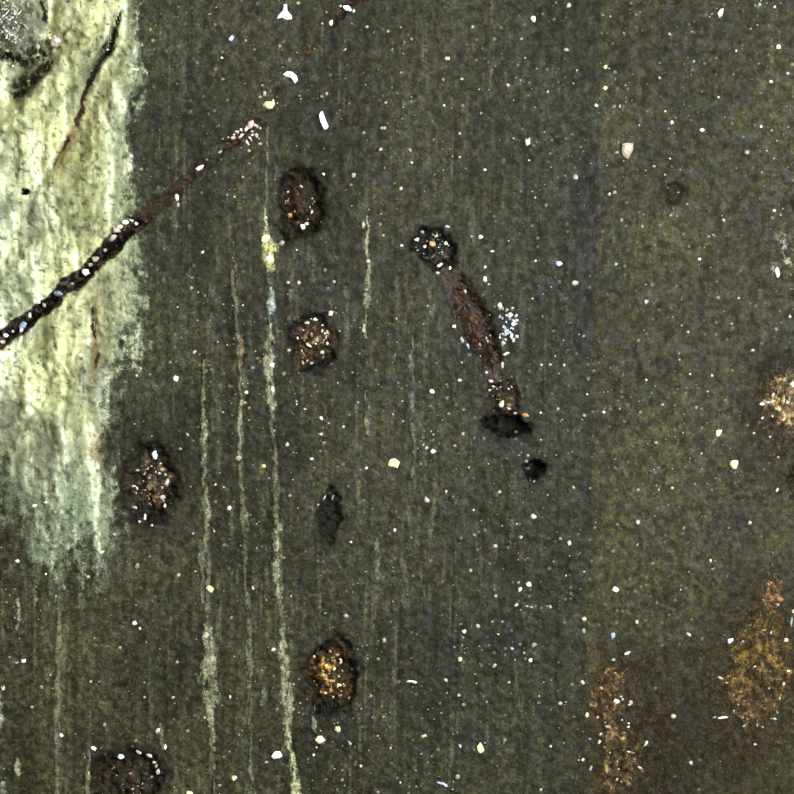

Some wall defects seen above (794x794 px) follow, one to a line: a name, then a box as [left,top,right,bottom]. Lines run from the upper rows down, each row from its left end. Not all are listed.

damp [0,0,145,330]
crack [0,91,278,363]
crack [329,0,365,26]
damp [0,236,149,794]
damp [156,723,167,750]
efflorescence [197,359,218,794]
damp [230,241,256,794]
efflorescence [262,127,300,794]